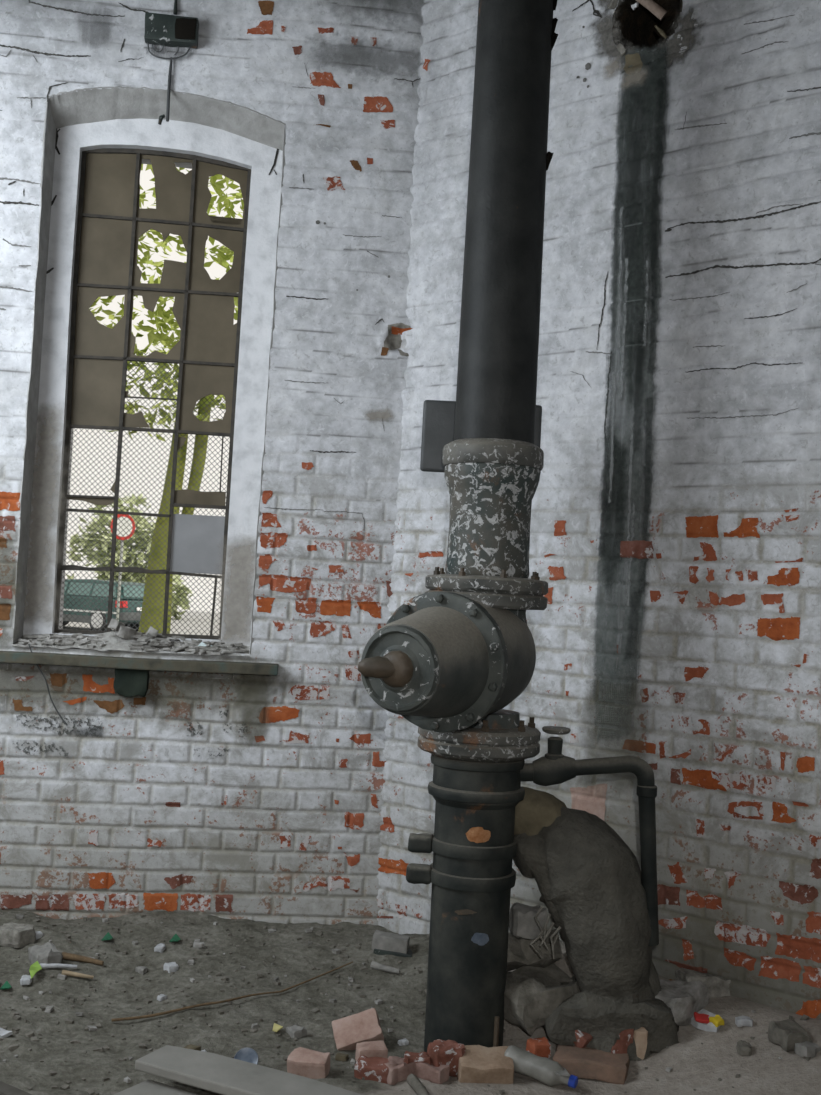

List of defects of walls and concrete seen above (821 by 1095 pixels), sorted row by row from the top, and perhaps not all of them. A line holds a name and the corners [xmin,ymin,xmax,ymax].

spalling [582,0,704,87]
crack [742,15,794,54]
crack [675,112,727,130]
crack [789,131,821,139]
crack [665,180,821,232]
crack [665,258,821,319]
leakage [608,207,629,503]
peeling [0,491,20,548]
leakage [627,412,635,541]
peeling [256,490,393,638]
peeling [650,515,803,641]
peeling [657,834,821,1019]